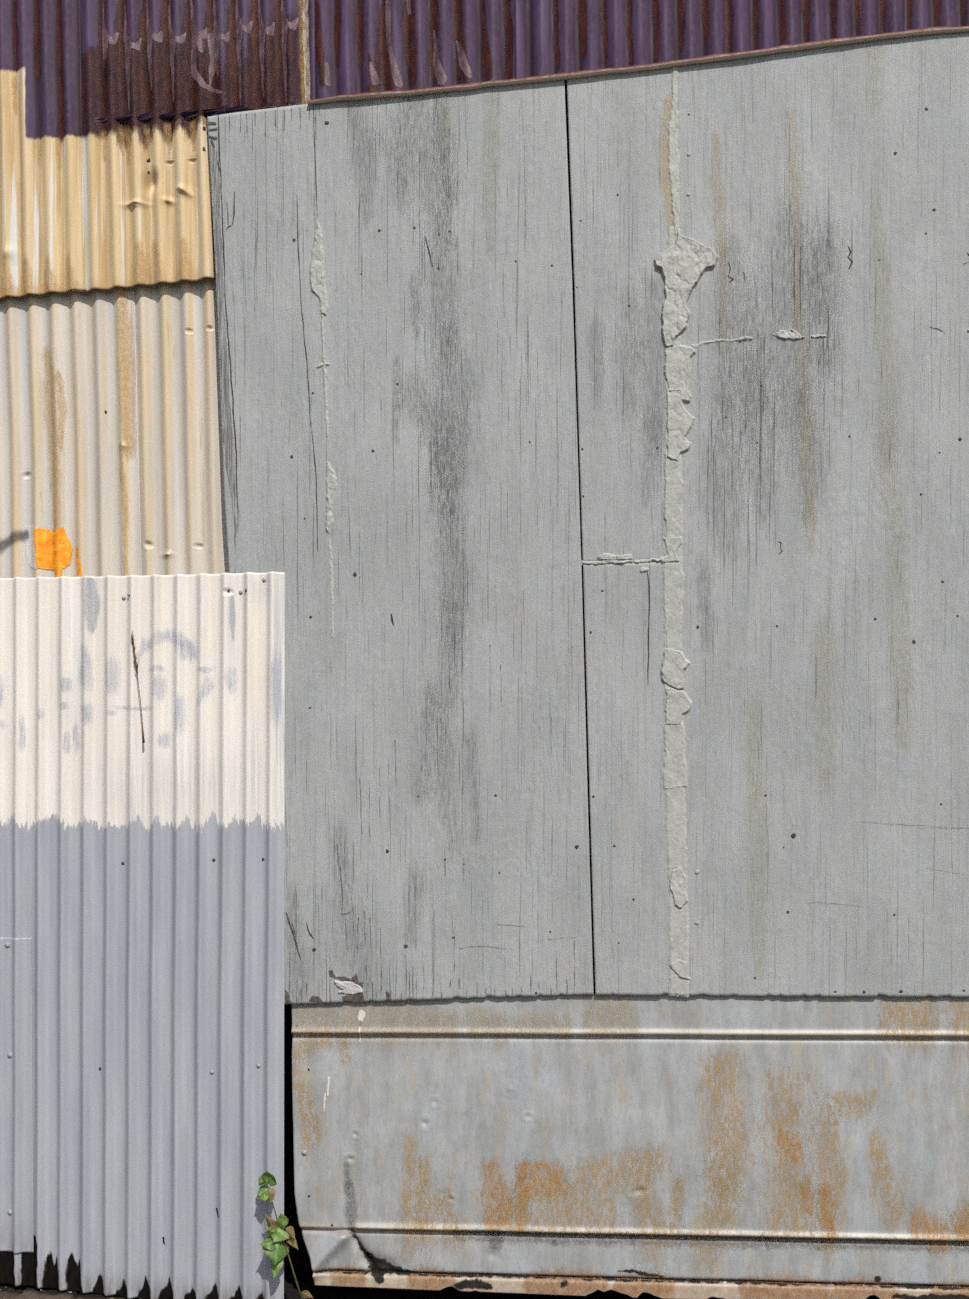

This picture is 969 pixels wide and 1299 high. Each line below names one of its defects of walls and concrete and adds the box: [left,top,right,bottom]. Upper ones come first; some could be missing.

rust [578,0,608,64]
rust [625,0,634,64]
rust [702,0,733,53]
rust [57,0,65,160]
rust [79,0,514,159]
peeling [772,329,827,341]
peeling [581,67,753,998]
rust [483,1153,680,1250]
rust [333,1267,364,1286]
rust [409,1271,454,1290]
rust [525,1273,674,1298]
rust [739,1278,894,1299]